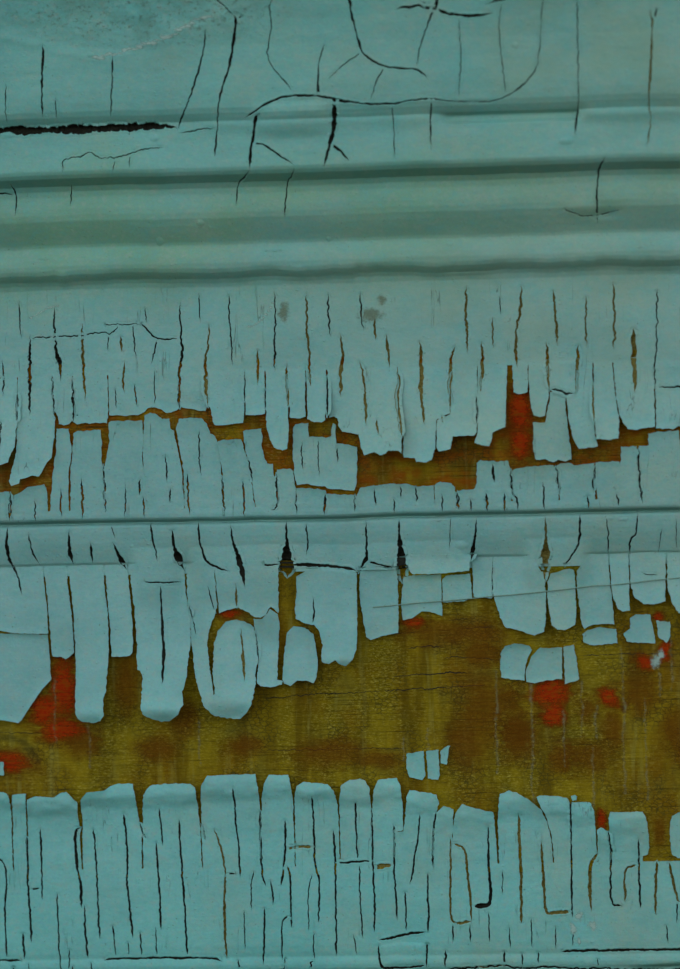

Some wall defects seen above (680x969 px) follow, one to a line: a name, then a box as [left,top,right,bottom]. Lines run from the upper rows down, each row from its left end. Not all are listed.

crack [0,0,545,217]
crack [572,0,582,136]
crack [645,8,660,147]
peeling [0,357,680,515]
crack [0,281,680,685]
peeling [0,552,680,723]
peeling [0,746,649,873]
crack [0,787,680,969]
peeling [670,812,680,858]